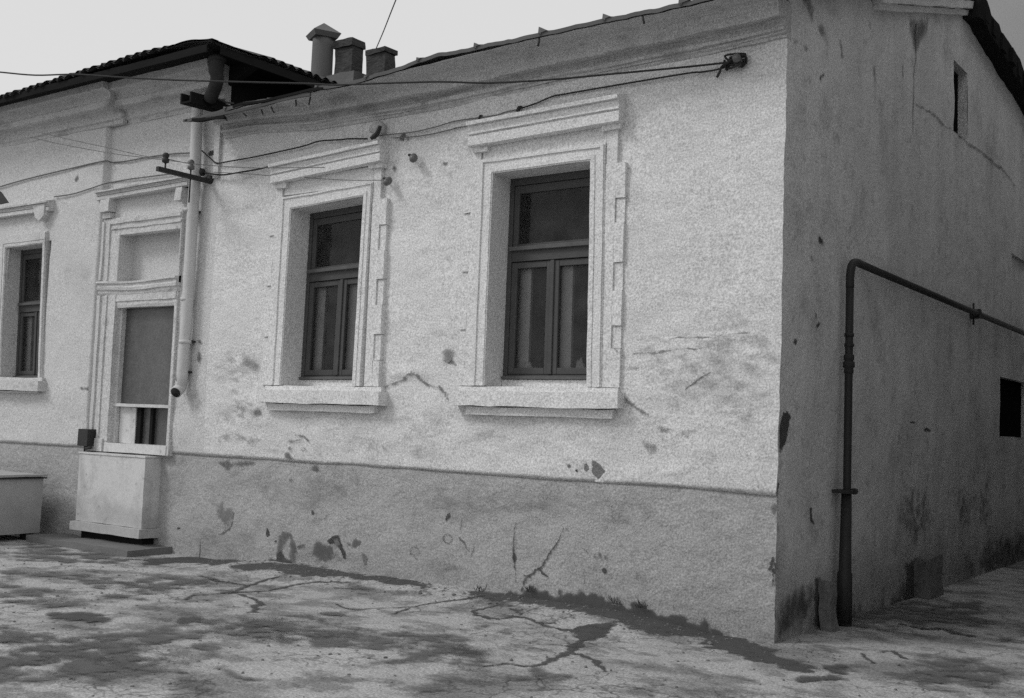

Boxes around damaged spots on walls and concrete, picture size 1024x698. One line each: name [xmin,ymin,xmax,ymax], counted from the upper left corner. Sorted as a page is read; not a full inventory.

crack [633,336,708,369]
crack [384,373,449,400]
flaking render [780,412,791,452]
flaking render [567,458,608,483]
flaking render [327,533,371,568]
crack [184,522,625,672]